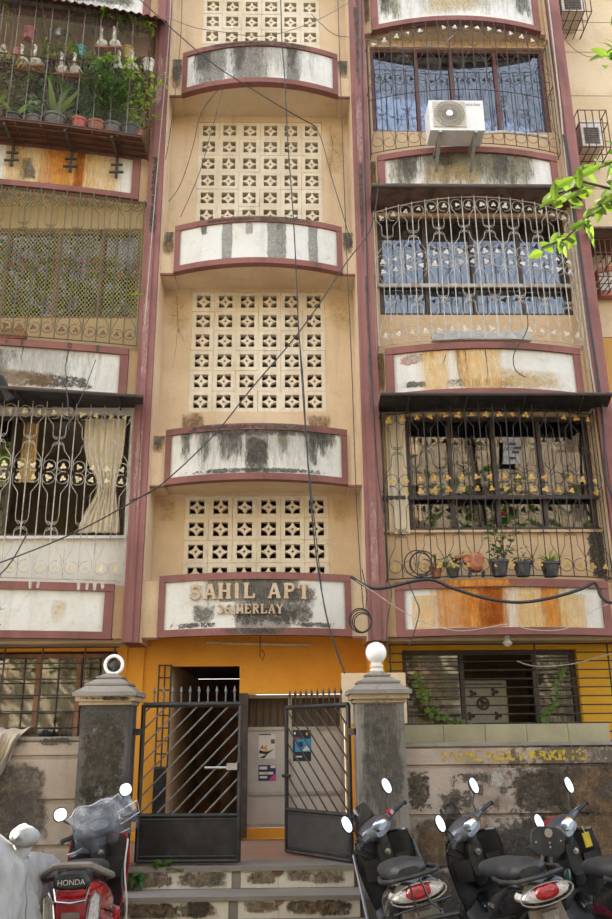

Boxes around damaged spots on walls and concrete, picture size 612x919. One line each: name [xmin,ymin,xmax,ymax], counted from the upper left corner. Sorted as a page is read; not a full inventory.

damp [194,41,306,84]
rust [5,145,116,191]
damp [389,153,534,184]
damp [343,161,376,252]
damp [0,338,92,390]
rust [424,349,500,390]
damp [181,413,335,475]
rust [413,579,586,628]
damp [37,712,124,832]
damp [0,763,47,842]
damp [412,819,463,919]
damp [479,814,547,871]